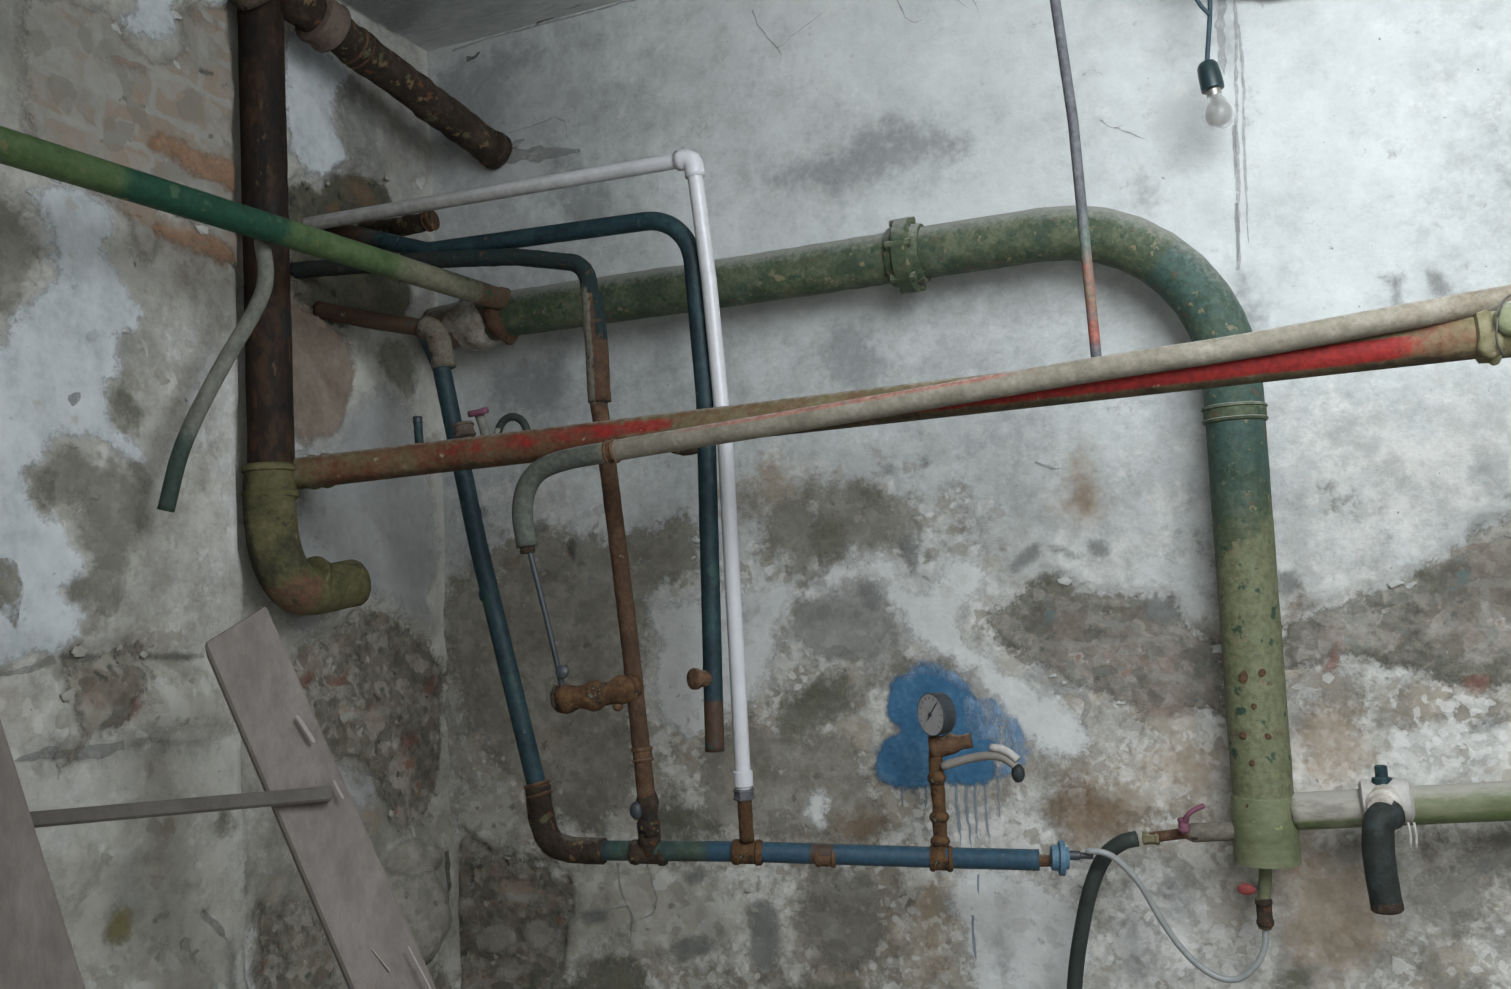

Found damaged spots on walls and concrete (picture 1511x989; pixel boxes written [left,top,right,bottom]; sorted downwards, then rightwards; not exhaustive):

spalling [17,0,235,201]
spalling [87,189,237,265]
damp [30,446,149,629]
spalling [292,564,526,828]
flaking render [491,513,700,834]
damp [650,598,705,739]
damp [720,482,1090,761]
spalling [1282,521,1511,694]
spalling [432,834,758,989]